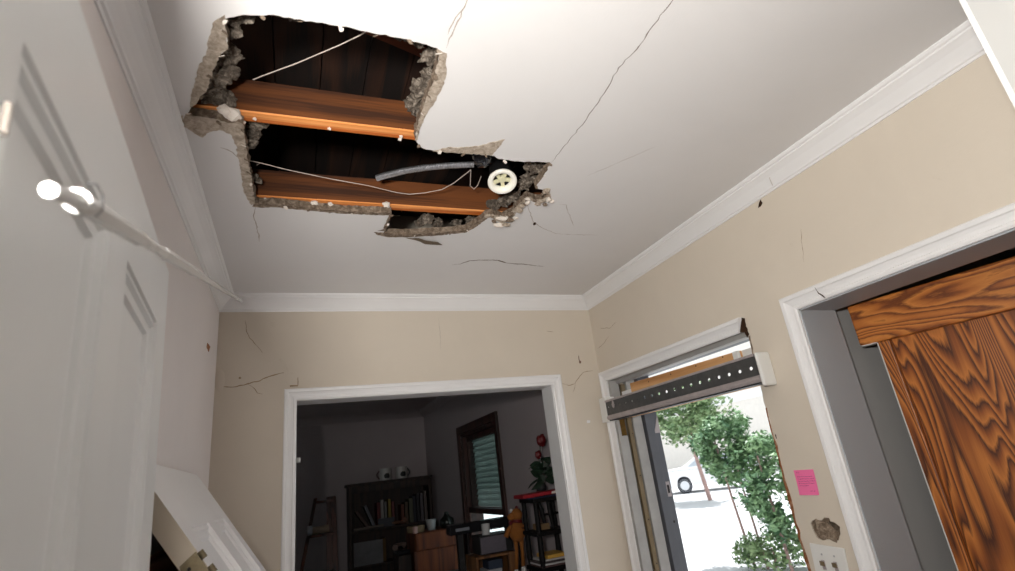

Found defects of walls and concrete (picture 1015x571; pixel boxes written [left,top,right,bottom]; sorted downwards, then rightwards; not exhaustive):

flaking render [181,15,554,245]
crack [446,1,467,48]
crack [553,0,673,161]
flaking render [765,408,811,571]
spalling [811,517,840,543]